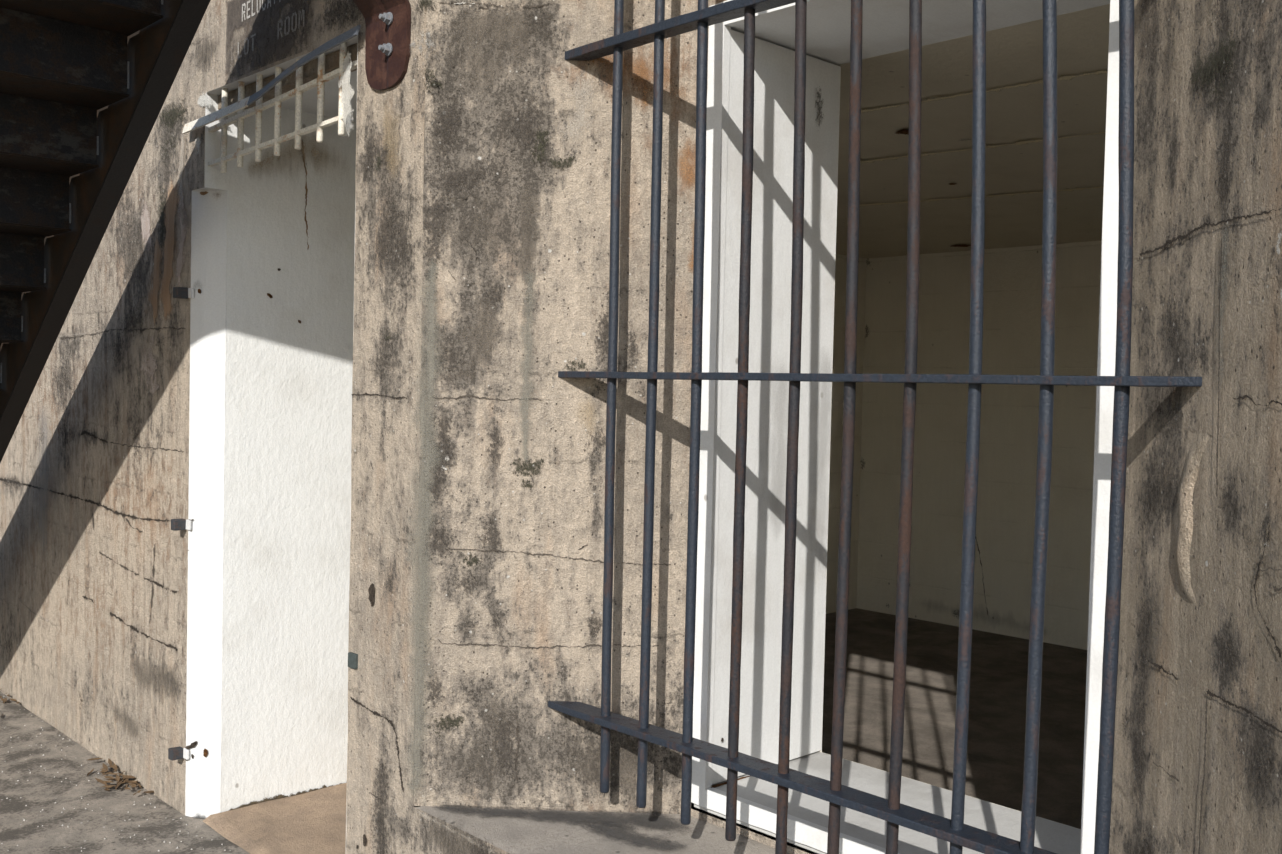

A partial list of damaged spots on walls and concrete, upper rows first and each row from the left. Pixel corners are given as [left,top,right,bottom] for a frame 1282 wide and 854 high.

leakage [506,78,594,170]
crack [301,140,309,249]
crack [1140,209,1280,256]
leakage [520,190,539,460]
leakage [369,65,507,790]
leakage [1212,231,1269,566]
crack [0,476,178,651]
crack [1253,522,1282,662]
crack [350,697,404,800]
leakage [370,758,405,854]
leakage [1122,595,1157,806]
crack [1207,690,1282,733]